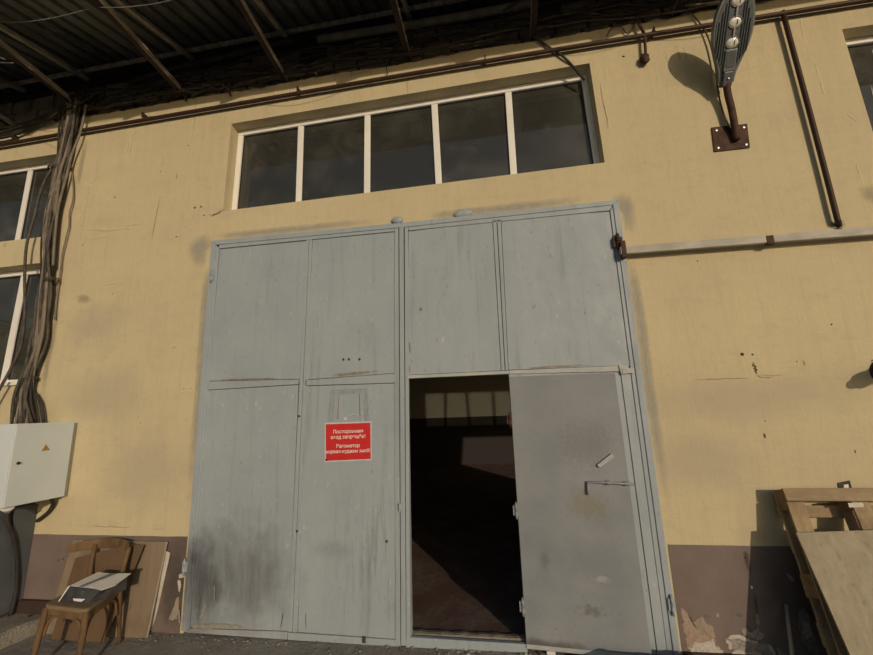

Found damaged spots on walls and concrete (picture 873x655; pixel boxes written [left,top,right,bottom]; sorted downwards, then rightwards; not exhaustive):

crack [705,362,782,380]
peeling [169,573,185,624]
peeling [680,607,776,655]